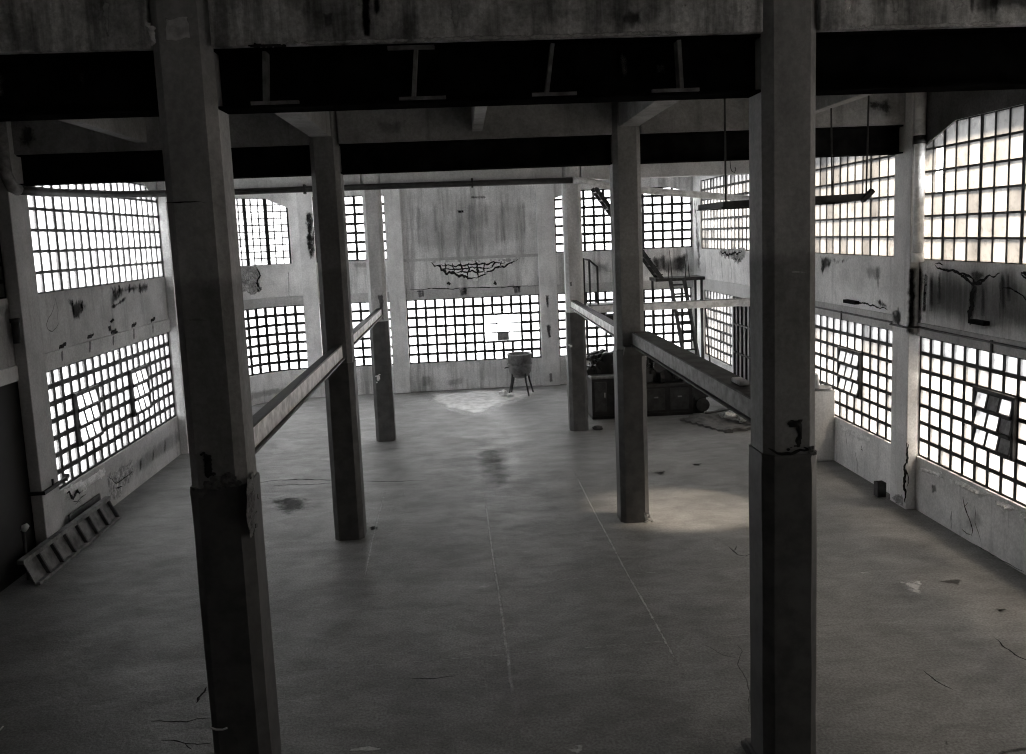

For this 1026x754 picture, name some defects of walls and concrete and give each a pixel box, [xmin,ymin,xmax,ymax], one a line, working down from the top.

peeling [241,266,262,295]
peeling [431,258,518,285]
crack [935,262,1026,325]
crack [768,447,809,455]
crack [902,443,910,502]